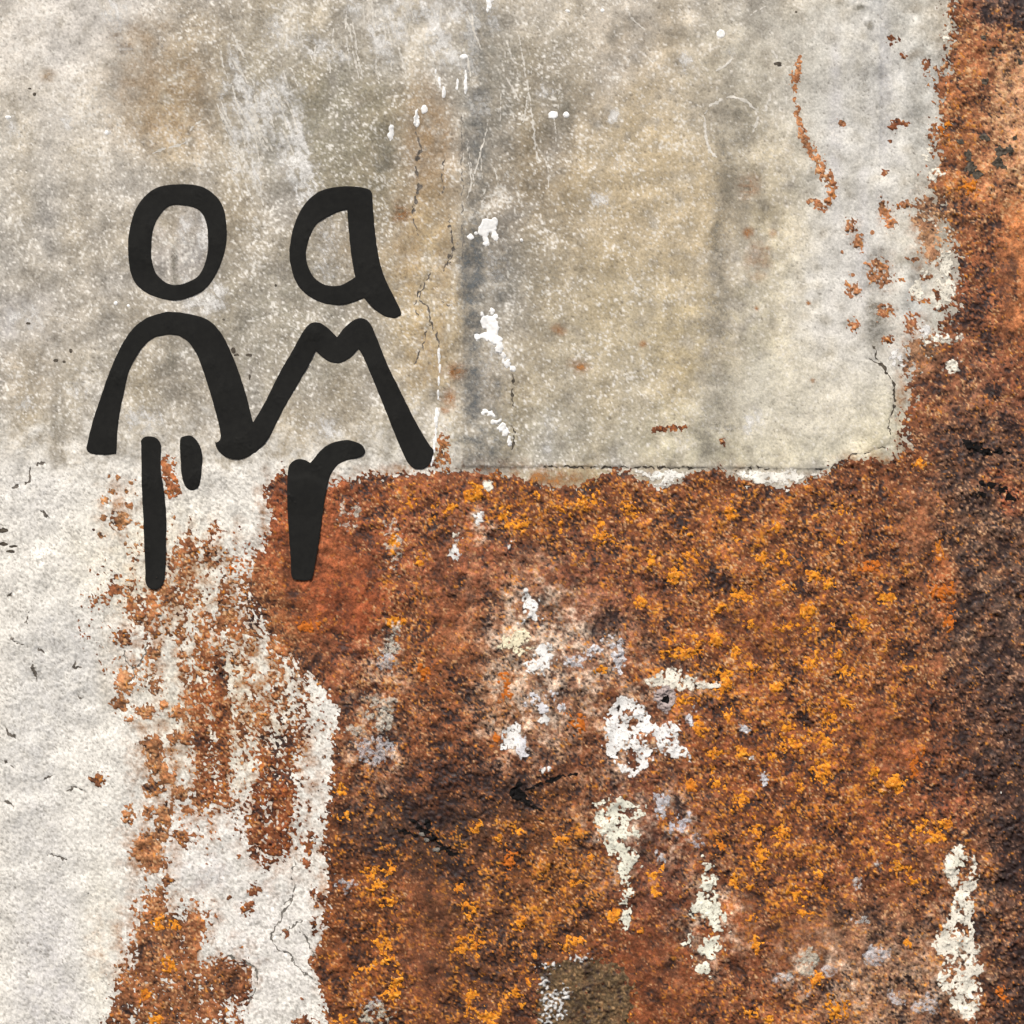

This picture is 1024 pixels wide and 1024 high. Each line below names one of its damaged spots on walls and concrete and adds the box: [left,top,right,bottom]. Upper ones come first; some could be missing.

corrosion [788,55,839,213]
crack [411,104,465,364]
corrosion [841,217,906,299]
corrosion [98,488,143,531]
corrosion [160,454,182,499]
crack [543,463,704,471]
crack [815,346,896,470]
corrosion [104,516,229,720]
corrosion [127,733,204,875]
corrosion [99,873,254,1024]
corrosion [240,880,262,918]
corrosion [300,830,319,857]